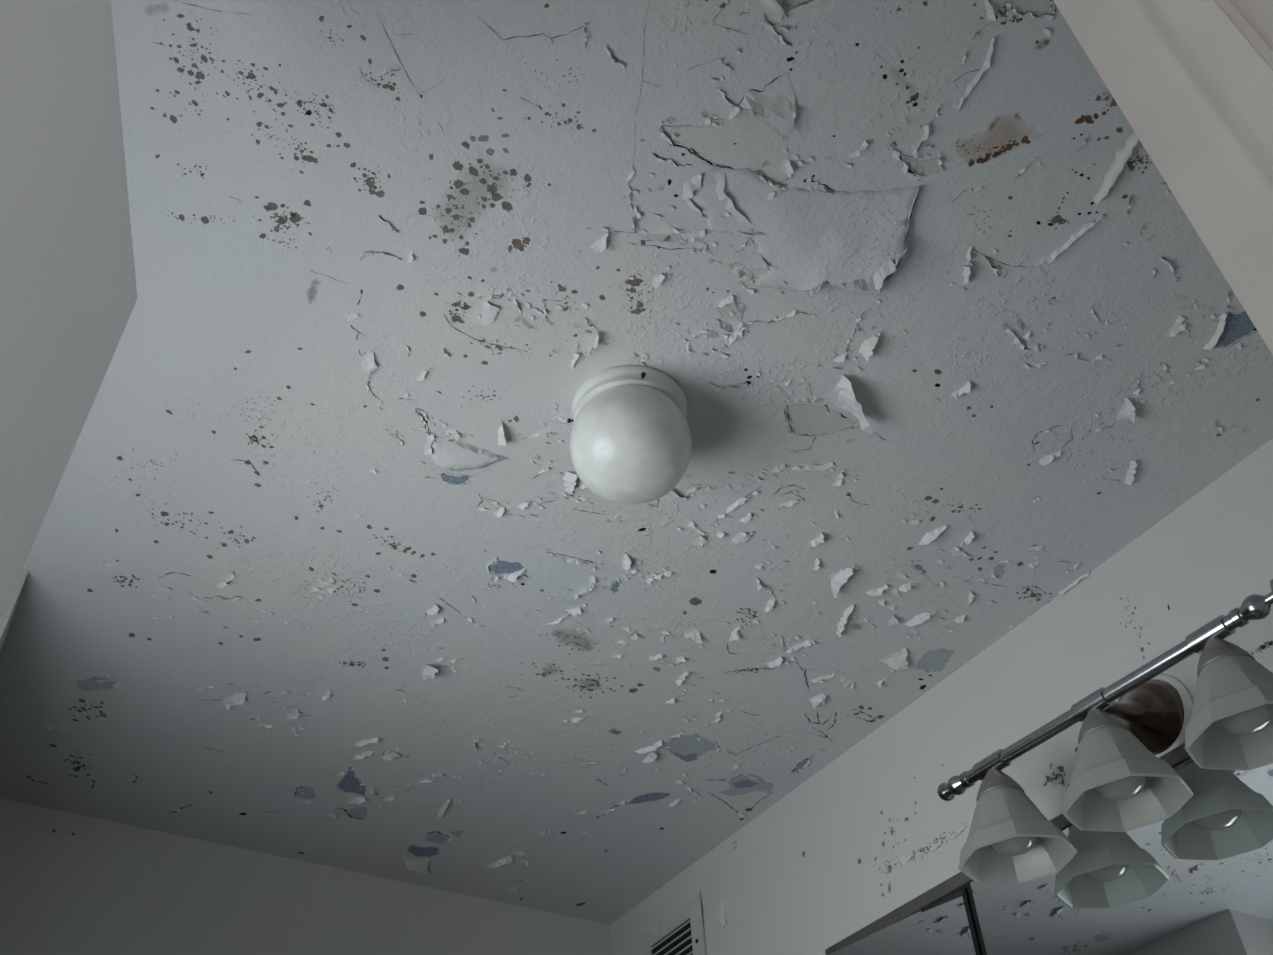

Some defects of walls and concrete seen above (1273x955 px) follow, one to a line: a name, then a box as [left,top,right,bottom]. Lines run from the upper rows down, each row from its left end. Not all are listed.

water stain [150,14,350,174]
water stain [230,196,312,251]
water stain [350,162,391,197]
water stain [418,108,531,256]
crack [478,1,657,117]
crack [627,153,635,233]
crack [712,1,798,71]
flaking render [575,72,967,366]
corrosion [956,115,1030,166]
flaking render [1071,288,1257,440]
flaking render [385,368,621,523]
peeling [516,300,1090,839]